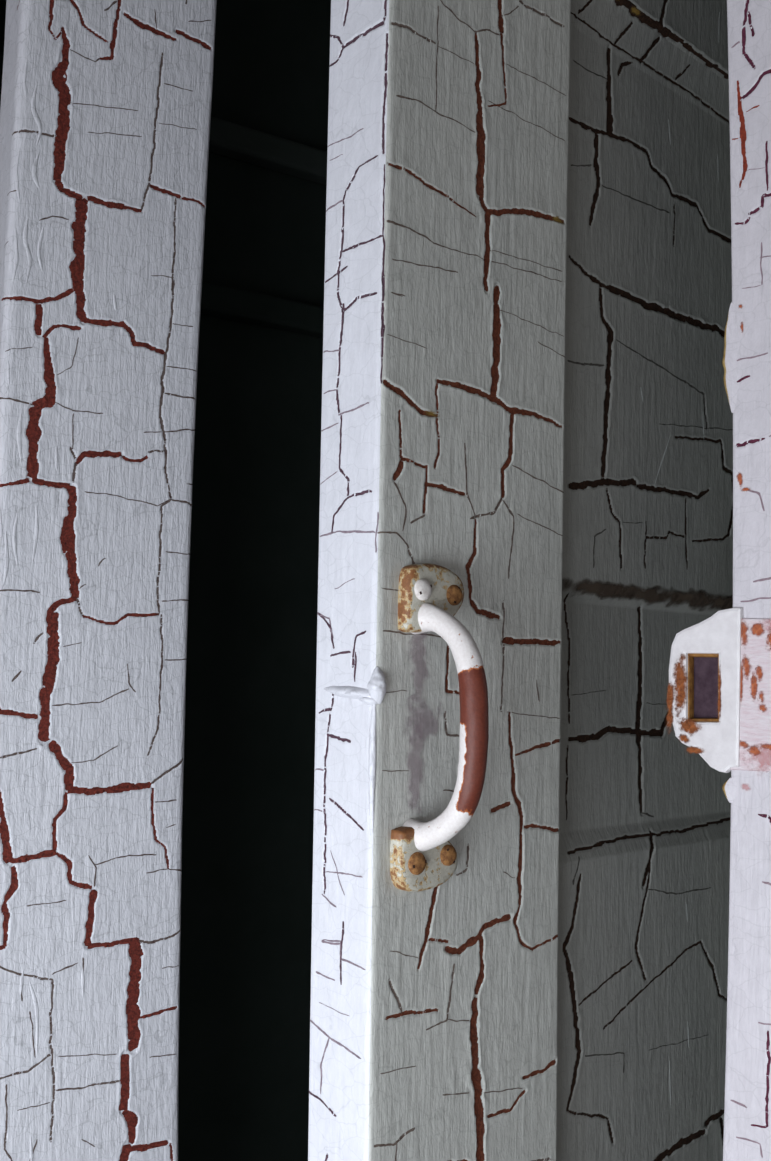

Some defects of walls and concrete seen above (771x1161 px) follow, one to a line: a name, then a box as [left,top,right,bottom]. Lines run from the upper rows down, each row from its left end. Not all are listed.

crack [0,0,211,1161]
crack [309,0,771,1161]
corrosion [666,654,703,754]